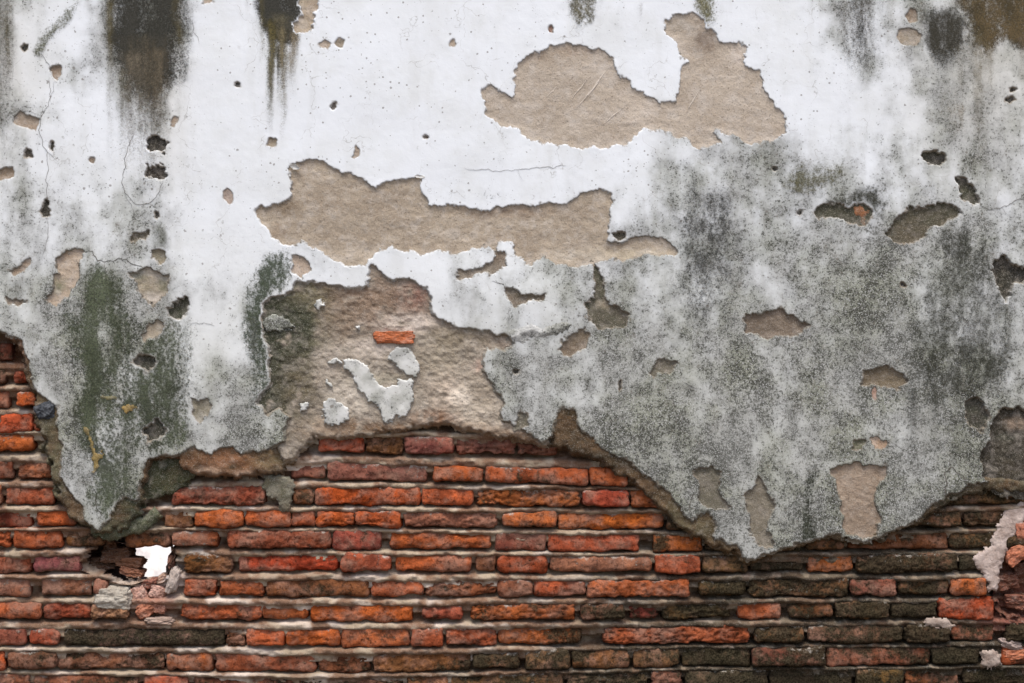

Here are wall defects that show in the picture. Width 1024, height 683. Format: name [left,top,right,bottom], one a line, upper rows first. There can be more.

damp [106,0,191,116]
damp [255,0,301,102]
peeling [481,12,786,149]
damp [924,0,1024,66]
flaking render [256,159,678,462]
damp [674,195,731,316]
peeling [744,309,808,339]
damp [835,187,888,212]
peeling [885,177,978,243]
damp [910,226,1012,401]
spalling [965,397,1024,625]
spalling [81,541,182,625]